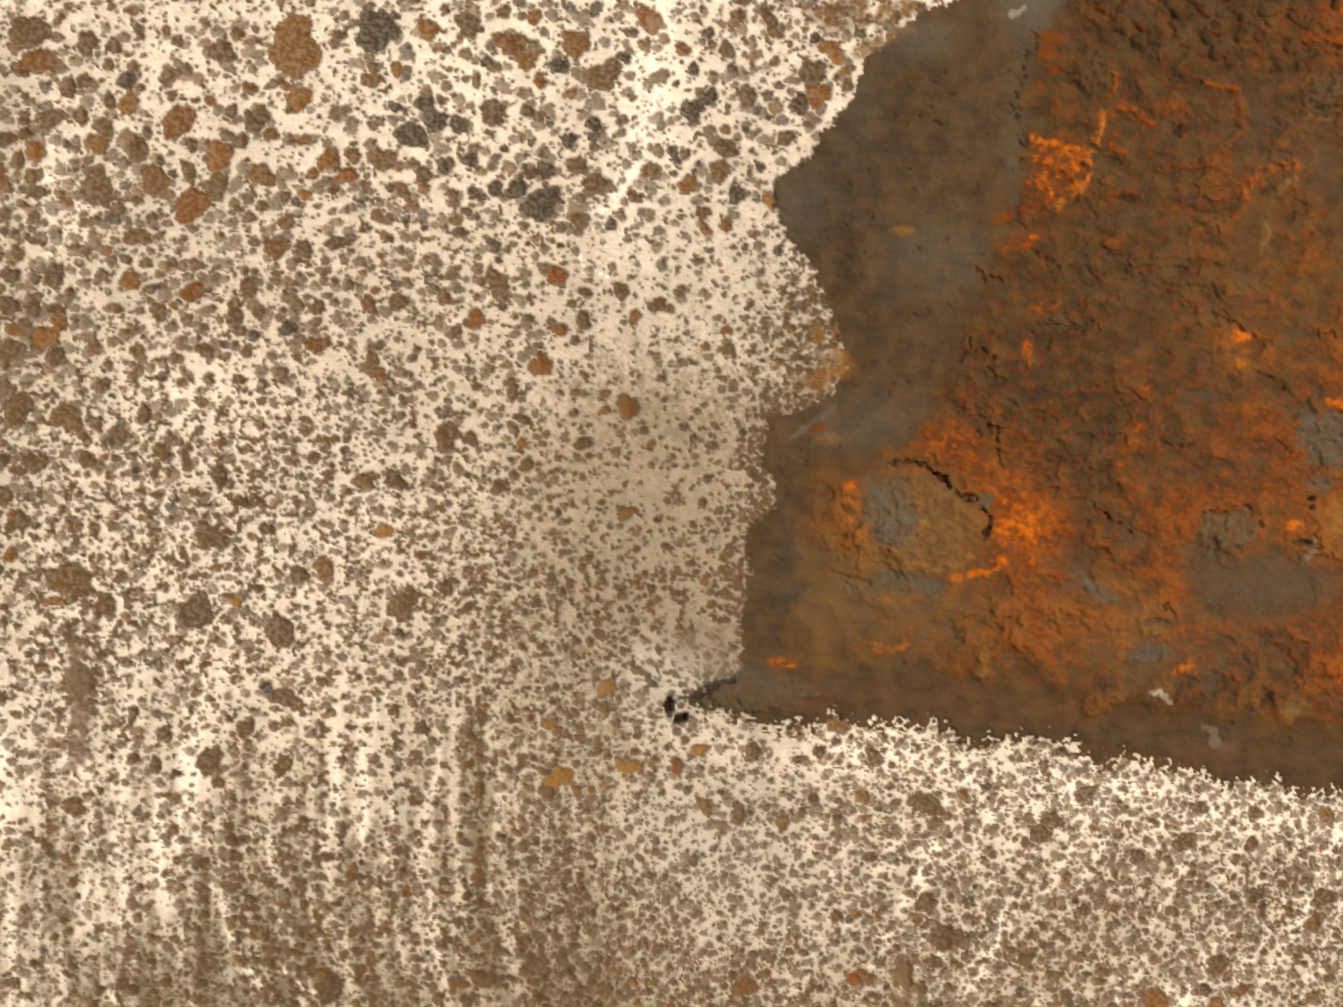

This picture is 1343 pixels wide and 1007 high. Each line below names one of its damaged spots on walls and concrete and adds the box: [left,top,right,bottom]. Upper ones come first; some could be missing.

spalling [788,38,848,112]
spalling [775,129,799,147]
spalling [719,340,738,357]
rust [731,0,1343,802]
crack [973,423,1011,469]
peeling [1281,397,1343,495]
crack [892,457,994,542]
peeling [1121,504,1343,668]
hole [669,742,712,779]
hole [743,740,764,764]
spalling [810,713,854,762]
spalling [863,742,884,768]